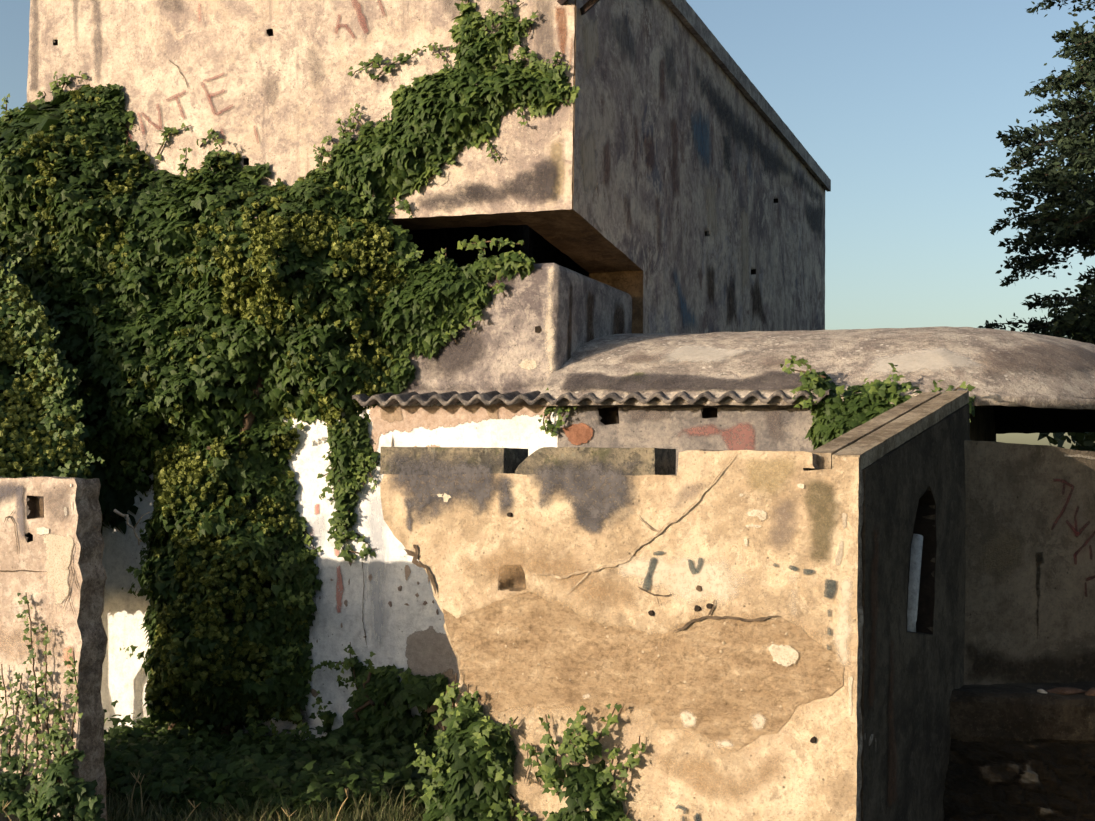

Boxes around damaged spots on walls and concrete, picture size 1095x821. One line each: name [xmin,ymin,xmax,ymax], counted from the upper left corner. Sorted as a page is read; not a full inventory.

water stain [422,160,557,208]
peeling [369,401,551,452]
spalling [562,423,593,445]
peeling [687,424,754,450]
water stain [0,483,24,538]
water stain [389,454,512,531]
water stain [534,462,632,533]
flaking render [744,509,767,546]
crack [404,545,436,594]
crack [638,587,674,606]
crack [674,598,777,632]
spalling [388,554,853,750]